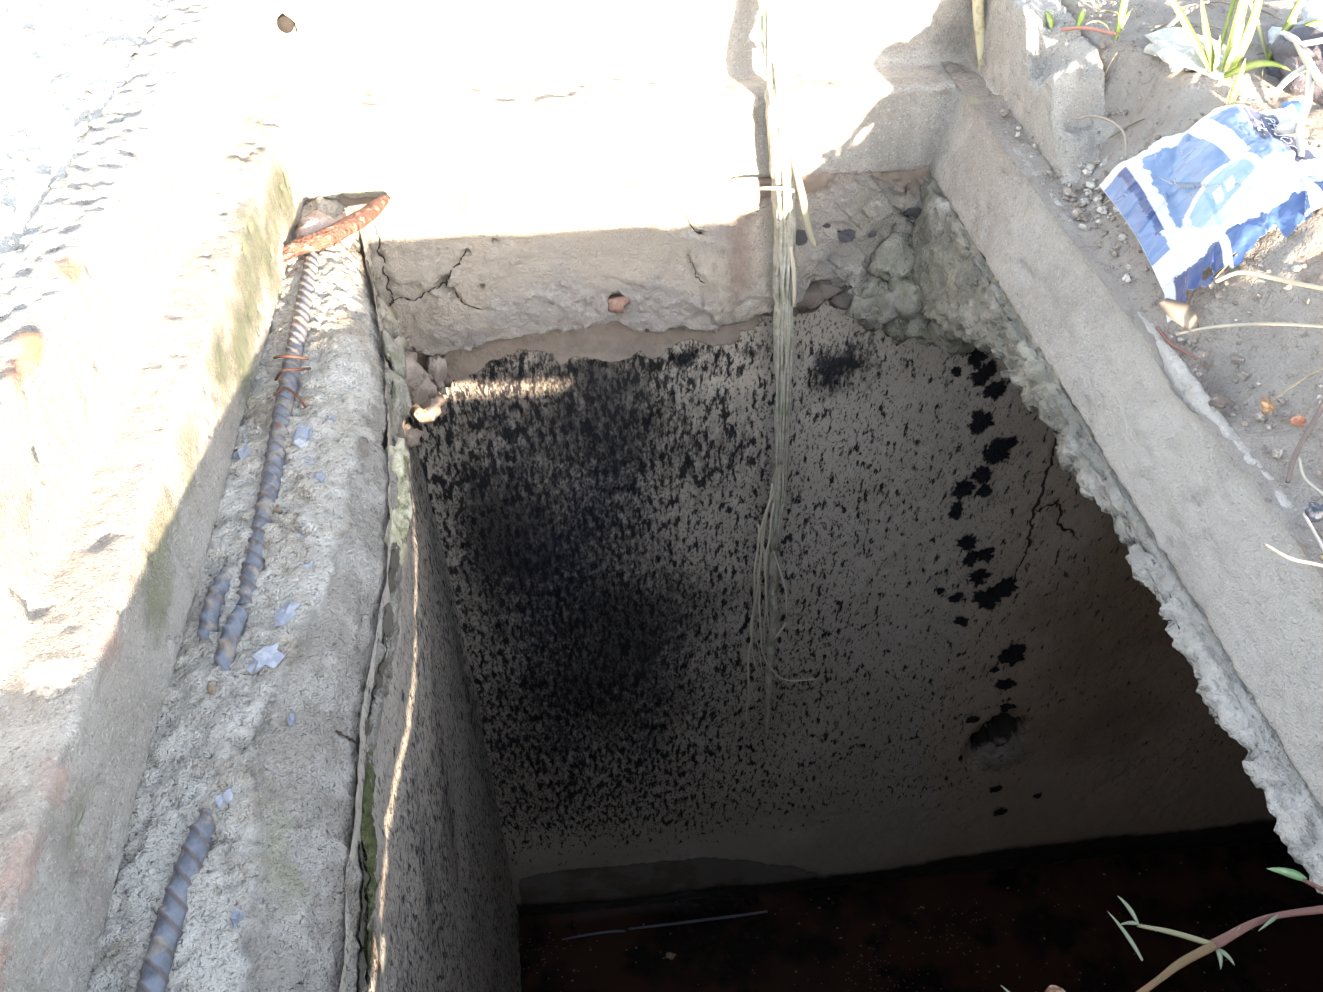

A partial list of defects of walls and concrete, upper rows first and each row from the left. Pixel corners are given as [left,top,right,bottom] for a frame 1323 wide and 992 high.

crack [373,221,483,310]
spalling [793,171,923,332]
water stain [808,331,882,403]
water stain [948,347,1019,520]
crack [1014,437,1079,580]
spalling [86,192,775,992]
water stain [454,347,724,766]
water stain [935,534,1019,627]
peeling [25,658,80,698]
water stain [989,643,1027,712]
spalling [970,713,1028,771]
water stain [989,785,1008,816]